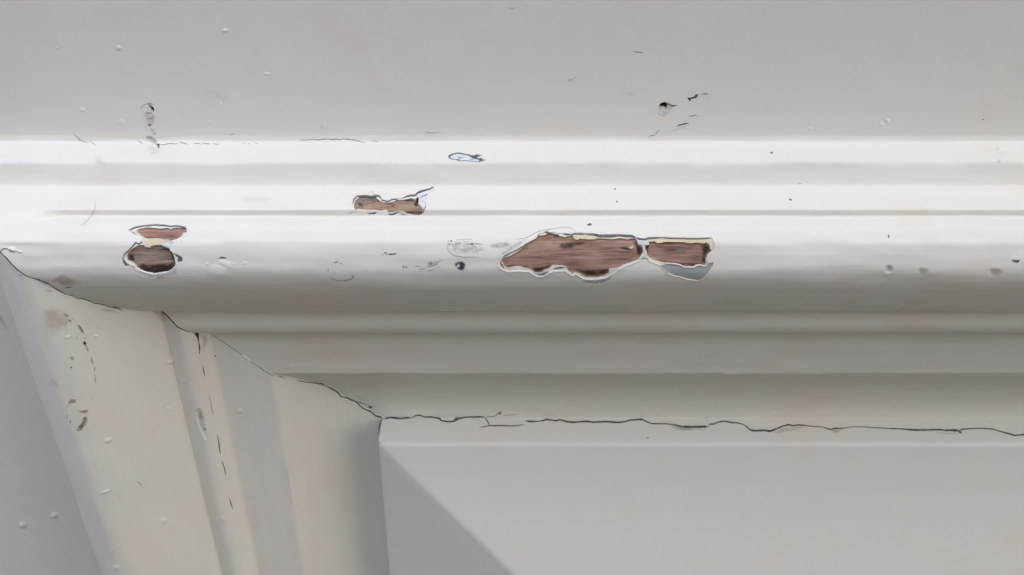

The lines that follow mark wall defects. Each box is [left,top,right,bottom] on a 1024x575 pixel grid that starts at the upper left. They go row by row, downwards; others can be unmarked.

peeling [348,187,434,215]
crack [0,251,122,311]
peeling [123,224,188,279]
peeling [497,227,714,285]
crack [160,310,1024,507]